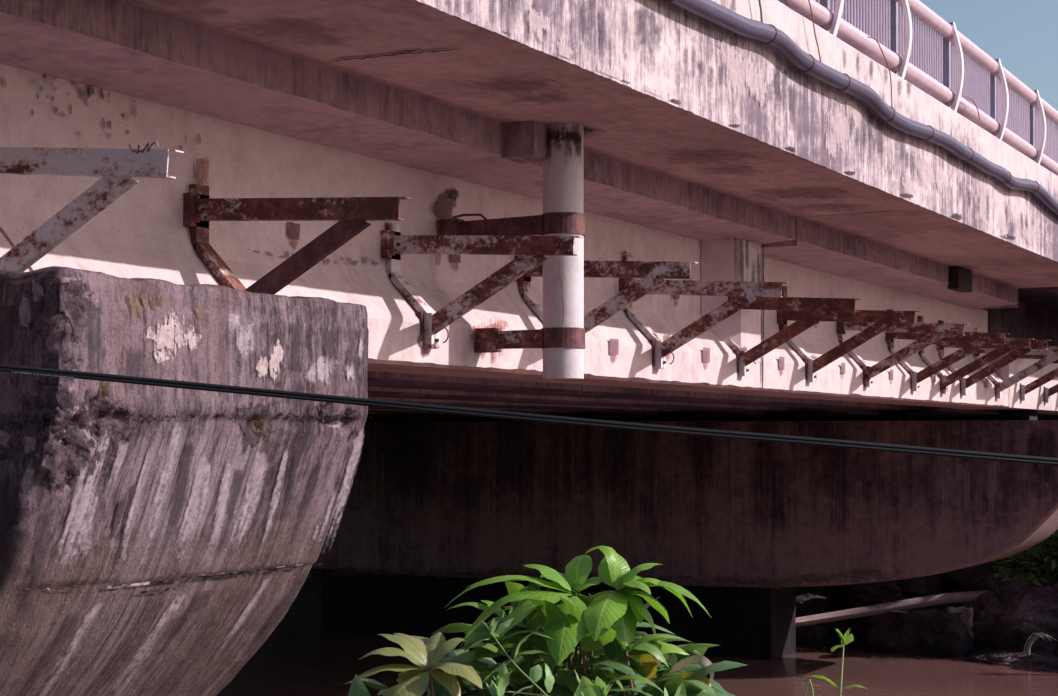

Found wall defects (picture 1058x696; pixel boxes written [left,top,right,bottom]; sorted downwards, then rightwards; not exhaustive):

damp [764,69,795,117]
corrosion [287,222,300,249]
corrosion [431,188,462,232]
corrosion [437,254,461,270]
peeling [144,309,201,363]
corrosion [610,339,619,362]
spalling [0,277,138,494]
damp [60,430,128,558]
damp [148,427,321,558]
damp [313,429,363,538]
damp [120,591,211,692]
damp [222,579,269,647]